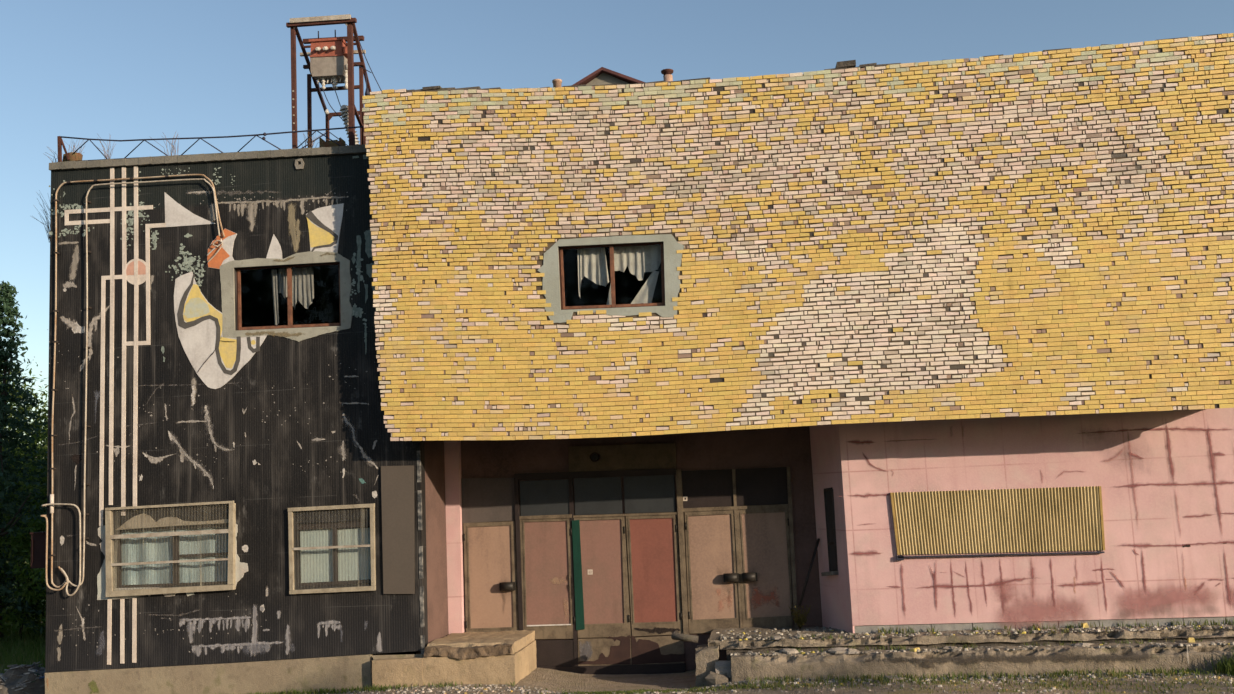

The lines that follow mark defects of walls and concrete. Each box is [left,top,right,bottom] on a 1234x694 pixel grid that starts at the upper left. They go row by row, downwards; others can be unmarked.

water stain [188,191,349,262]
spalling [143,447,174,465]
crack [1041,425,1180,527]
crack [1183,430,1230,603]
crack [888,553,1146,614]
water stain [1123,590,1209,612]
peeling [578,635,685,665]